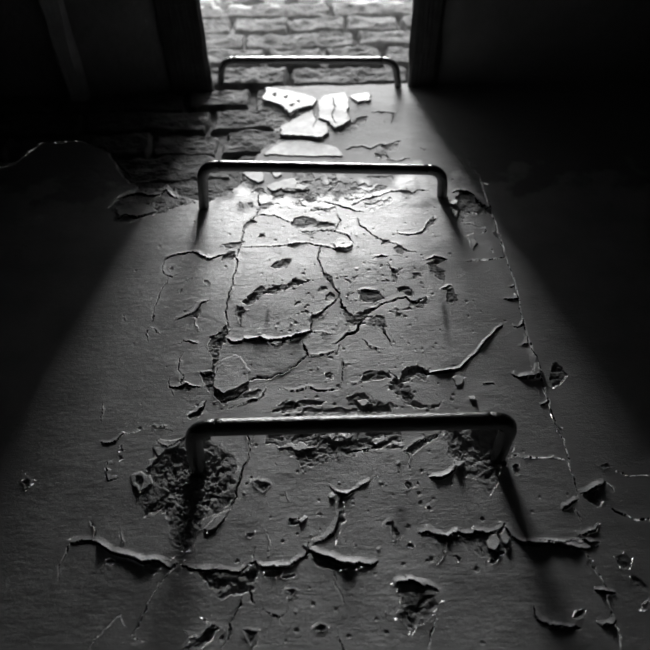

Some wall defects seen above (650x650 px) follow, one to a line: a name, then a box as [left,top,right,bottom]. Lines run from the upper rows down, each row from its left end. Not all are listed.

flaking render [0,87,397,203]
crack [327,184,438,255]
peeling [450,189,494,224]
crack [145,192,428,408]
flaking render [354,323,504,410]
flaking render [265,432,402,468]
flaking render [428,429,514,495]
crack [511,374,578,494]
flaking render [131,436,260,650]
flaking render [391,576,442,647]
peeling [417,521,514,565]
crack [505,523,621,648]